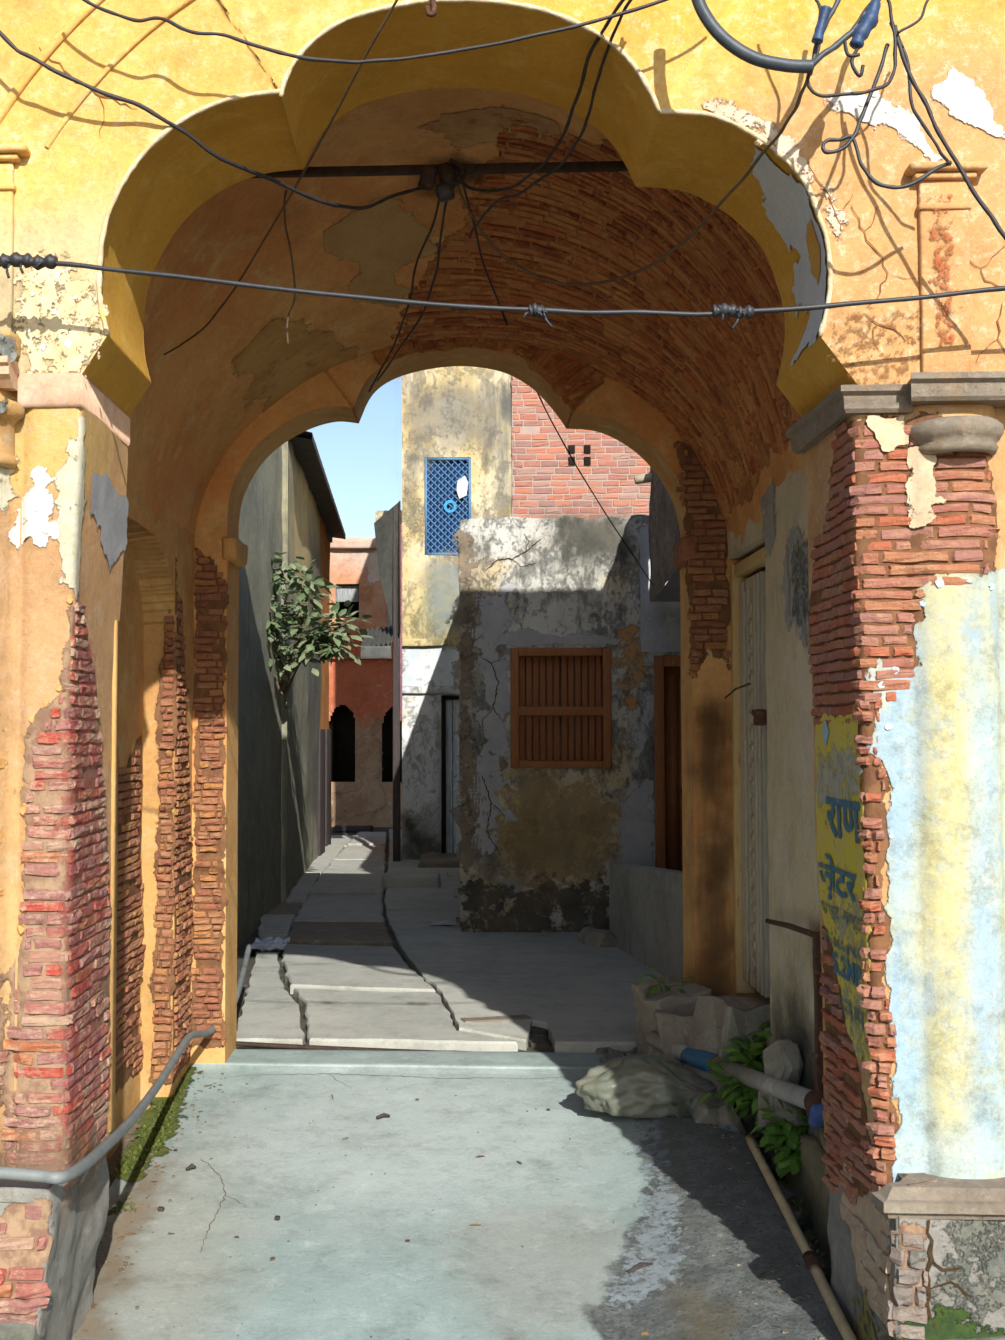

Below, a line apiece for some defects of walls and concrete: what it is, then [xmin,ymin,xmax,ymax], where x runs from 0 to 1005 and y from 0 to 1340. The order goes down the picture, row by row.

peeling [931,67,1005,138]
peeling [13,248,109,379]
crack [807,162,920,350]
crack [970,246,1005,362]
damp [790,538,809,627]
flaking render [231,88,1005,1340]
flaking render [0,416,230,1190]
damp [447,871,610,932]
flaking render [0,1198,53,1329]
damp [926,1220,1005,1329]